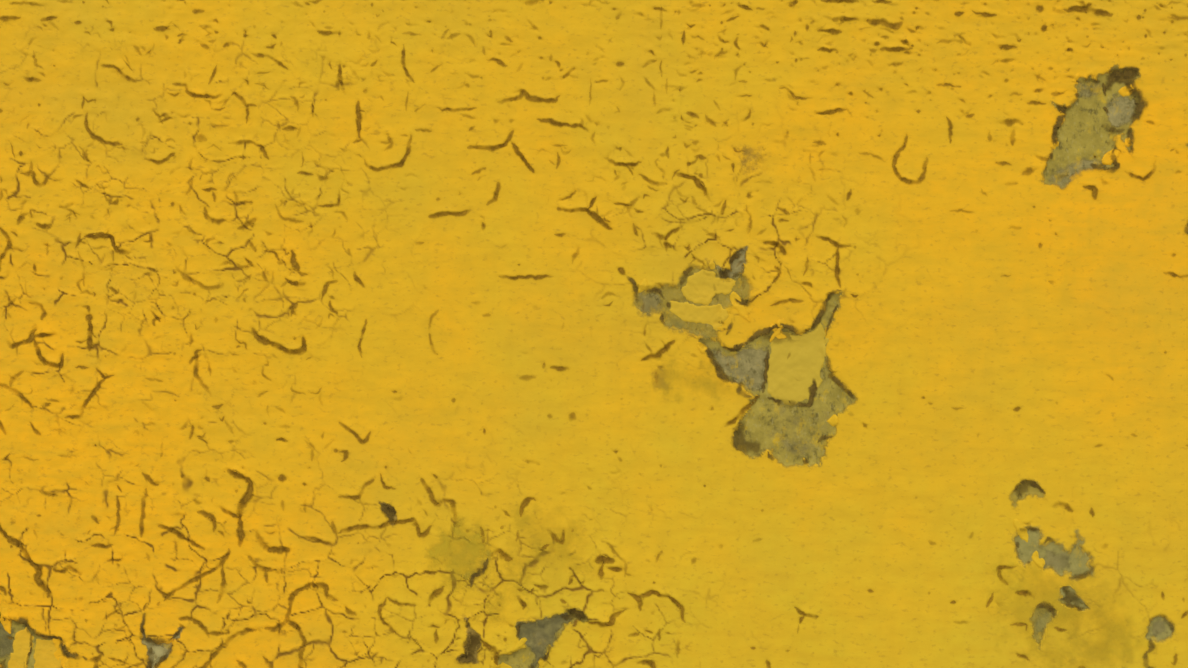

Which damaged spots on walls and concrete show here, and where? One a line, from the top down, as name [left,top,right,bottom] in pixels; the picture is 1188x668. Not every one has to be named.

crack [511,90,584,129]
peeling [1043,65,1147,189]
crack [203,188,363,354]
crack [11,312,113,430]
peeling [618,246,856,467]
crack [0,526,77,598]
peeling [0,607,87,668]
crack [92,470,455,668]
peeling [457,608,588,668]
crack [589,555,684,626]
peeling [1010,480,1093,643]
peeling [1143,616,1174,668]